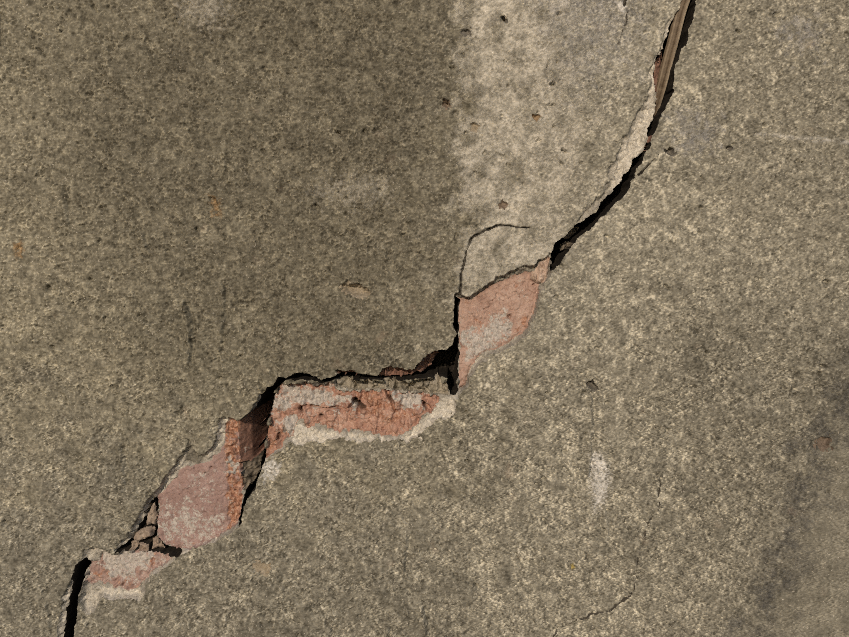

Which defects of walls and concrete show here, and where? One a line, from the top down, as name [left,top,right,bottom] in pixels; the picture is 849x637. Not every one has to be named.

crack [549,0,696,271]
crack [57,496,182,637]
spalling [79,252,552,615]
crack [239,225,530,527]
crack [553,475,663,637]